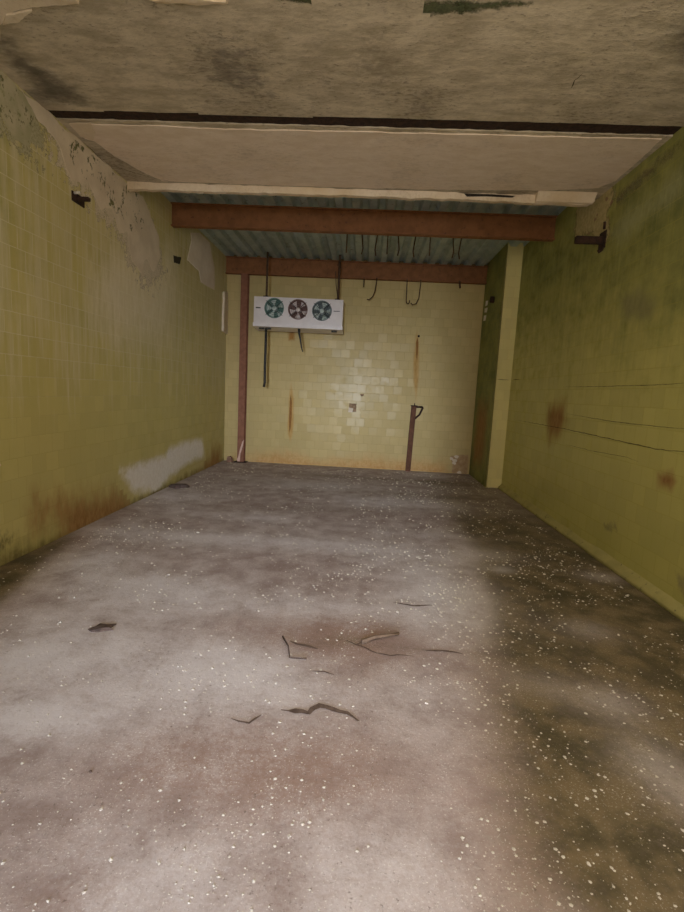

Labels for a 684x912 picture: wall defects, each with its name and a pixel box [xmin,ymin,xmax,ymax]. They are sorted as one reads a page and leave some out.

flaking render [0,0,79,25]
flaking render [0,71,662,291]
rust [178,373,455,482]
rust [469,387,493,481]
crack [529,415,684,460]
damp [0,462,130,566]
crack [347,638,462,656]
crack [231,703,359,724]